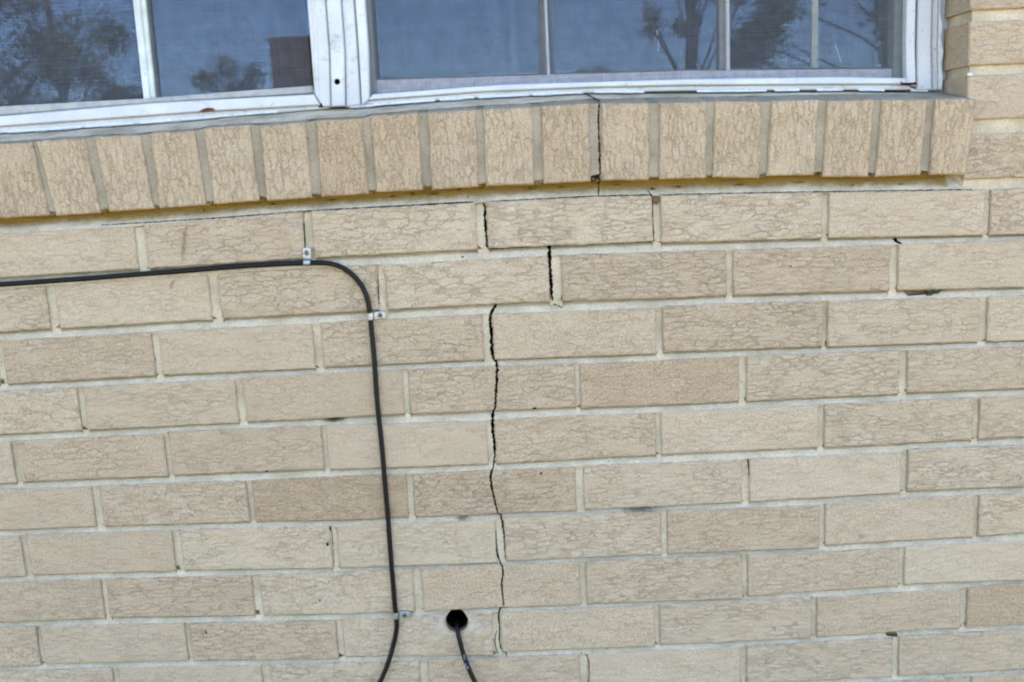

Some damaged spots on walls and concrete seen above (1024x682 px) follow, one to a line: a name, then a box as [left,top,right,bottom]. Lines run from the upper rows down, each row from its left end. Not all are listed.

crack [488,304,507,656]